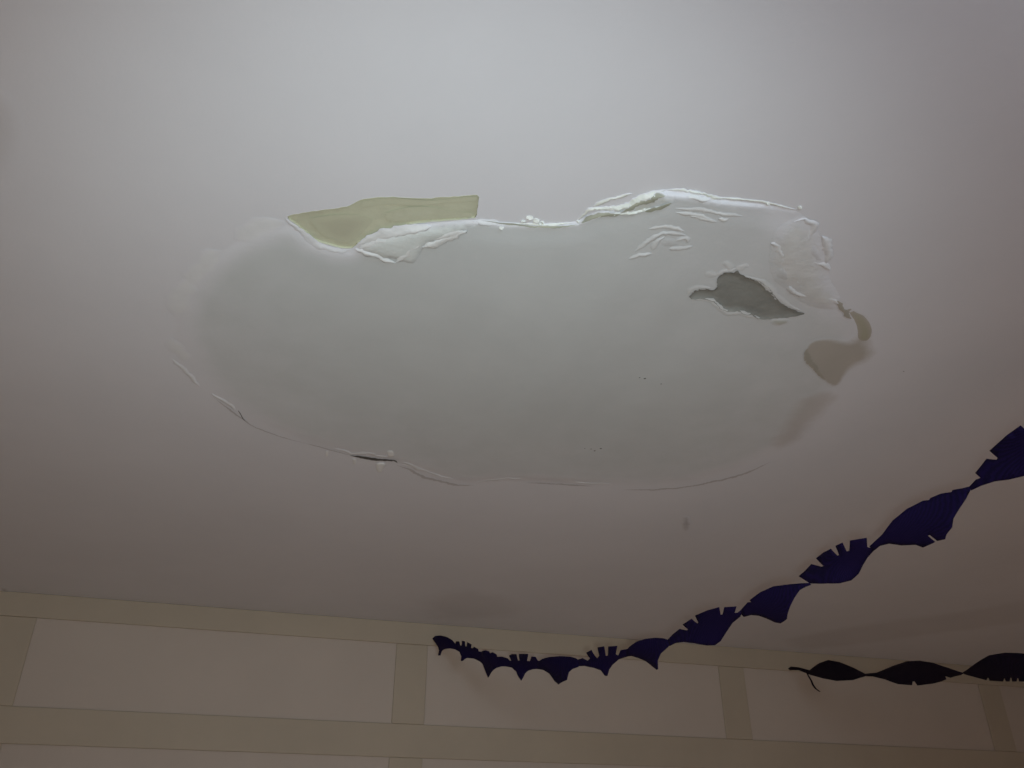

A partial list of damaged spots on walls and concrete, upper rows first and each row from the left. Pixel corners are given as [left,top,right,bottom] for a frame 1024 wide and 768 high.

peeling [286,195,499,263]
flaking render [686,260,804,326]
crack [173,360,772,491]
leakage [764,296,880,454]